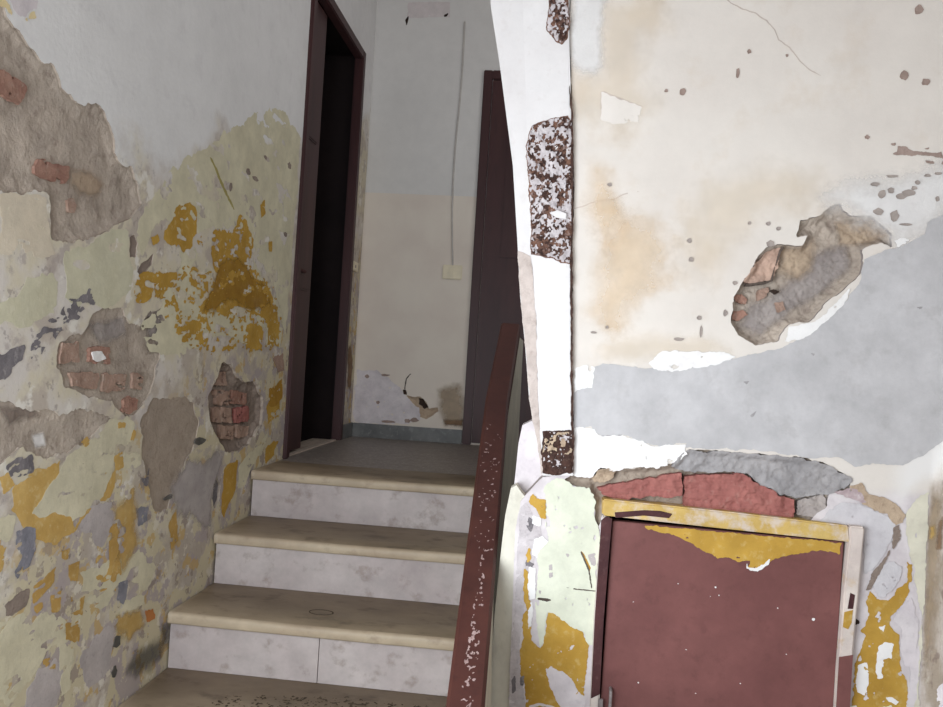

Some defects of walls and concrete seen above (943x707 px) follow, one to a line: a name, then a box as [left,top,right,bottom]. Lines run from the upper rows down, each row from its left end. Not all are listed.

corrosion [546,0,570,45]
crack [727,0,821,76]
corrosion [526,116,572,264]
spalling [723,167,943,345]
peeling [0,0,301,707]
peeling [353,369,439,424]
corrosion [541,430,573,475]
spalling [508,251,853,707]
peeling [850,492,934,707]